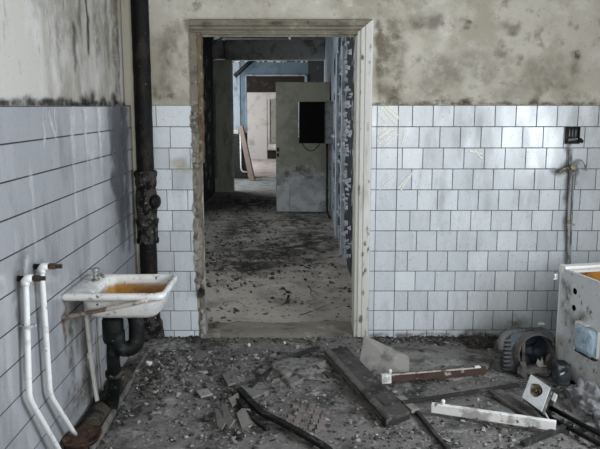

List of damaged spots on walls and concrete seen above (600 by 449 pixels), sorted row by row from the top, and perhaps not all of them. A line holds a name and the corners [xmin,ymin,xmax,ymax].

leakage [0,88,130,243]
spalling [190,56,213,337]
peeling [280,35,360,276]
leakage [376,35,389,54]